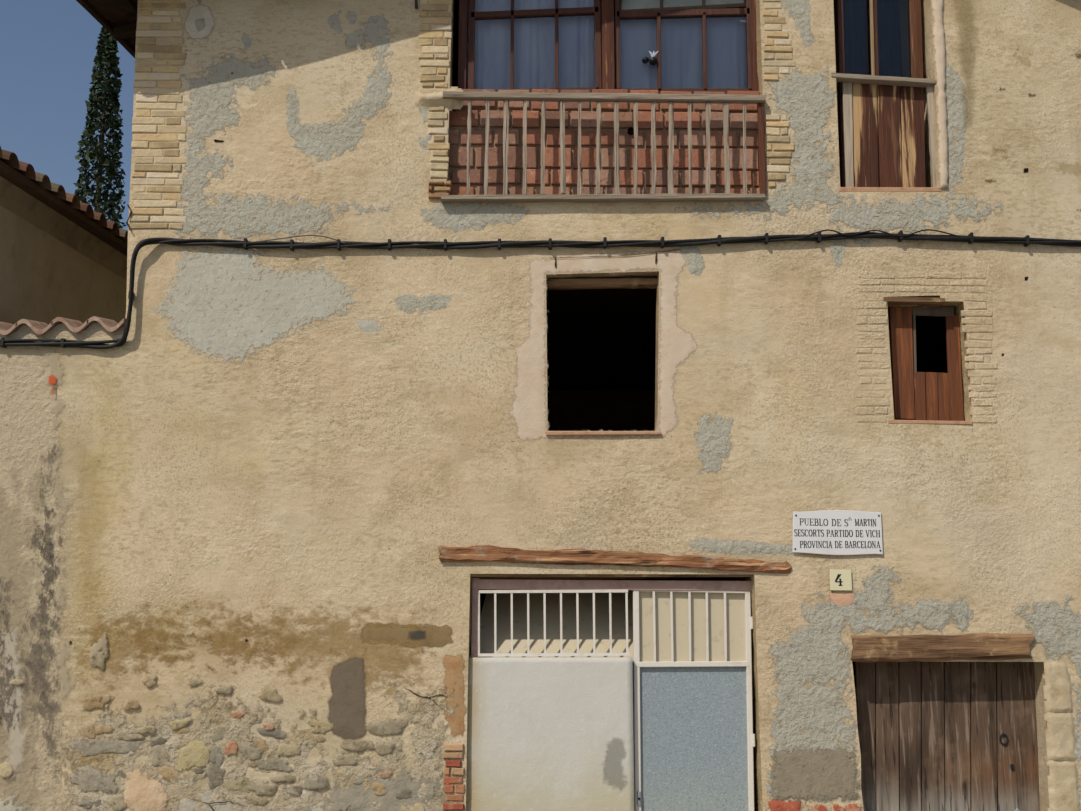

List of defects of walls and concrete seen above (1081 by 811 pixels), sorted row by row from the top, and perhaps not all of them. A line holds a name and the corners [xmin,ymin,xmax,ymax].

peeling [285,88,302,141]
water stain [0,441,72,773]
water stain [409,630,425,639]